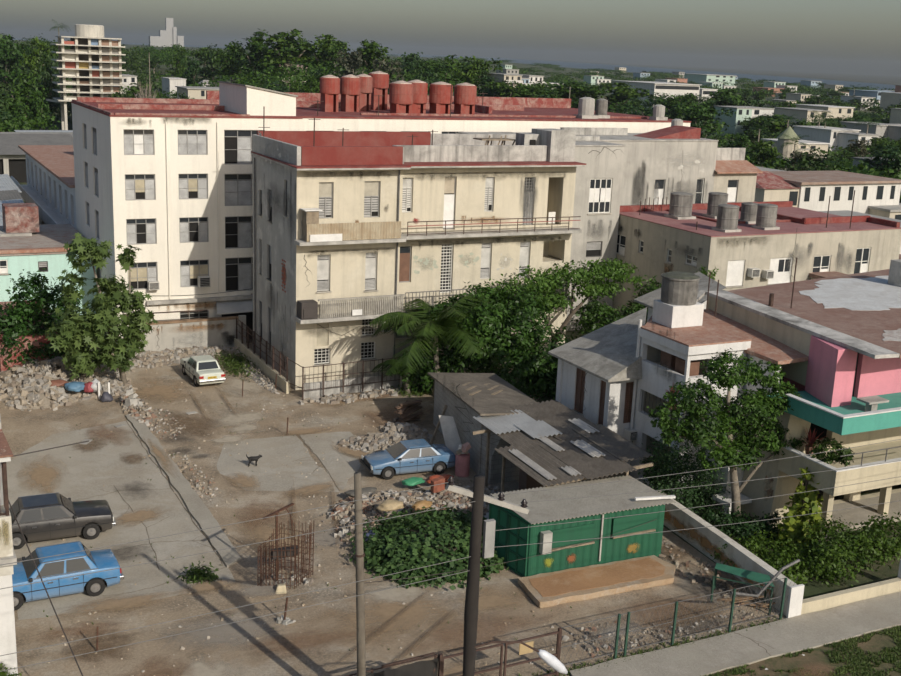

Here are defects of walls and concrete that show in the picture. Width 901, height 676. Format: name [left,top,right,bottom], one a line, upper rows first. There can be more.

damp [633,163,648,205]